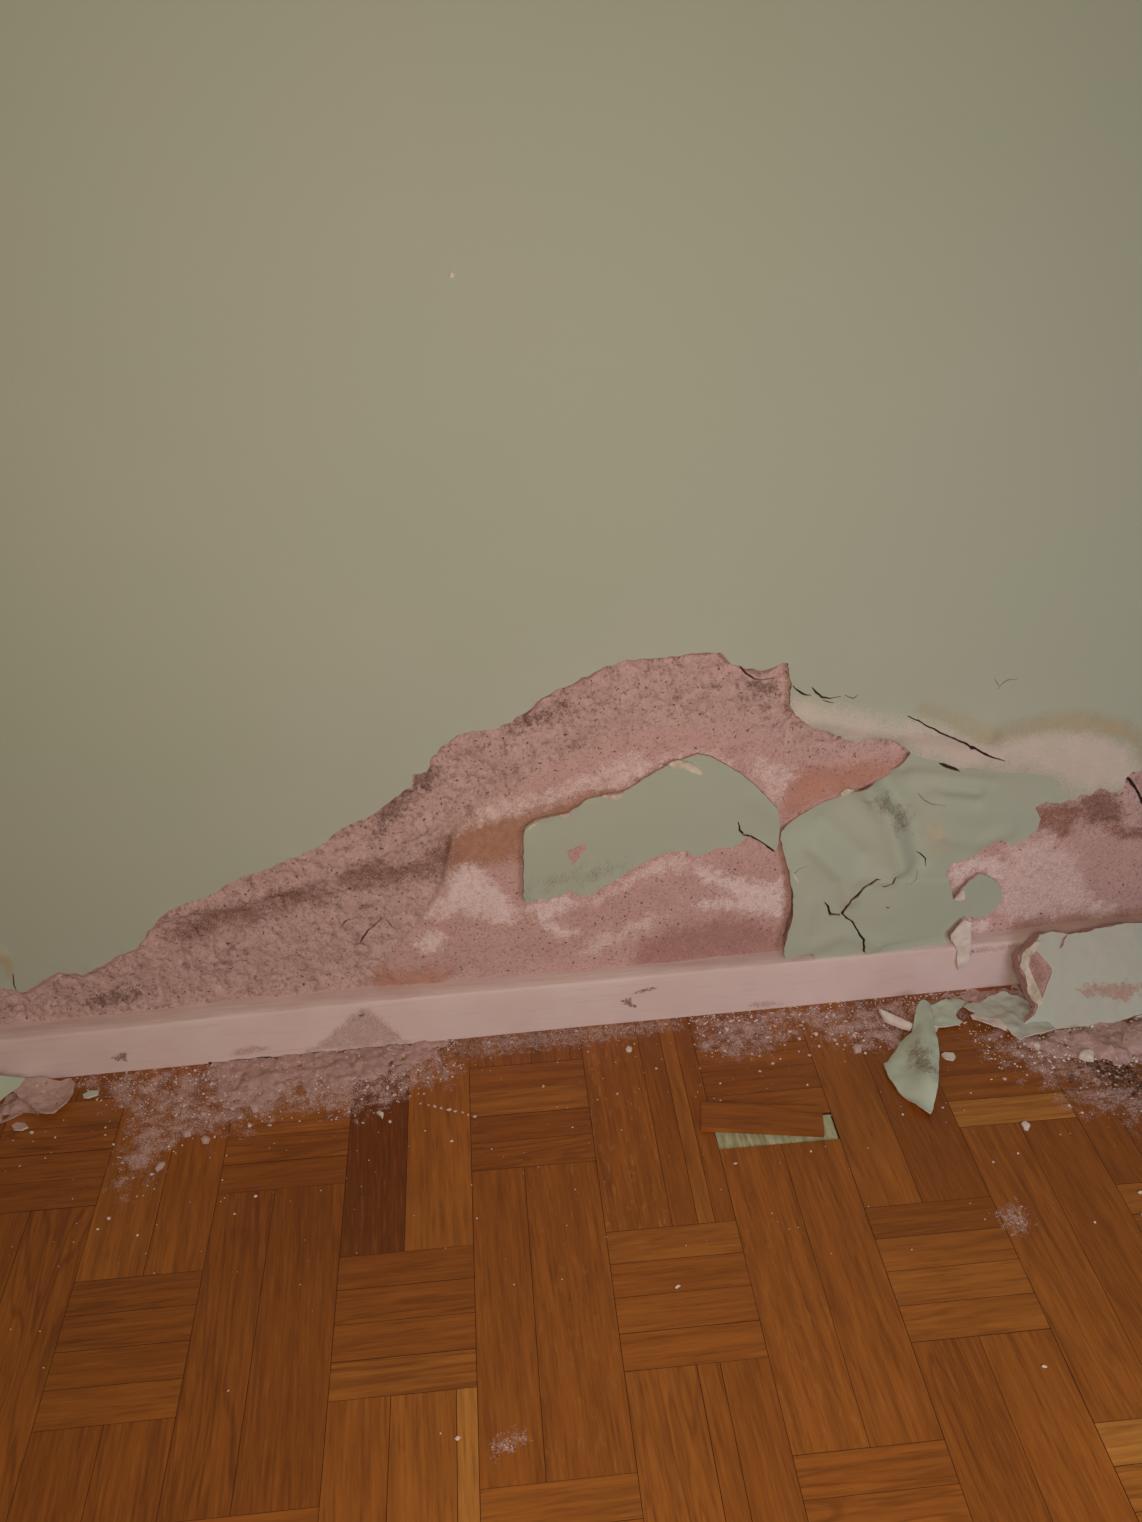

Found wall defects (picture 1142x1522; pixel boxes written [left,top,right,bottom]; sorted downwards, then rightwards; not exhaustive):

water stain [742,673,1142,800]
crack [908,716,1002,771]
crack [1126,777,1142,804]
flaking render [0,652,910,1024]
crack [738,822,774,852]
flaking render [946,771,1142,971]
crack [824,851,925,952]
peeling [306,1008,409,1053]
peeling [931,991,1055,1040]
peeling [941,1052,956,1061]
peeling [83,1090,99,1099]